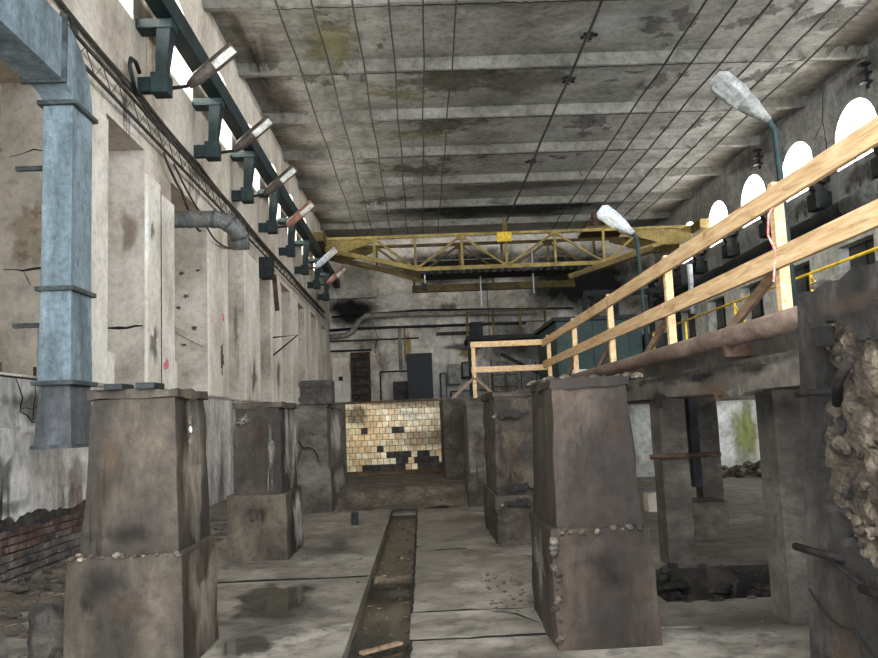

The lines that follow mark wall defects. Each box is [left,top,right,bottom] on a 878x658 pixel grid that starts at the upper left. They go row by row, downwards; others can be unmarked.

damp [409,119,478,133]
peeling [363,446,442,471]
spalling [823,320,878,568]
flaking render [0,511,180,583]